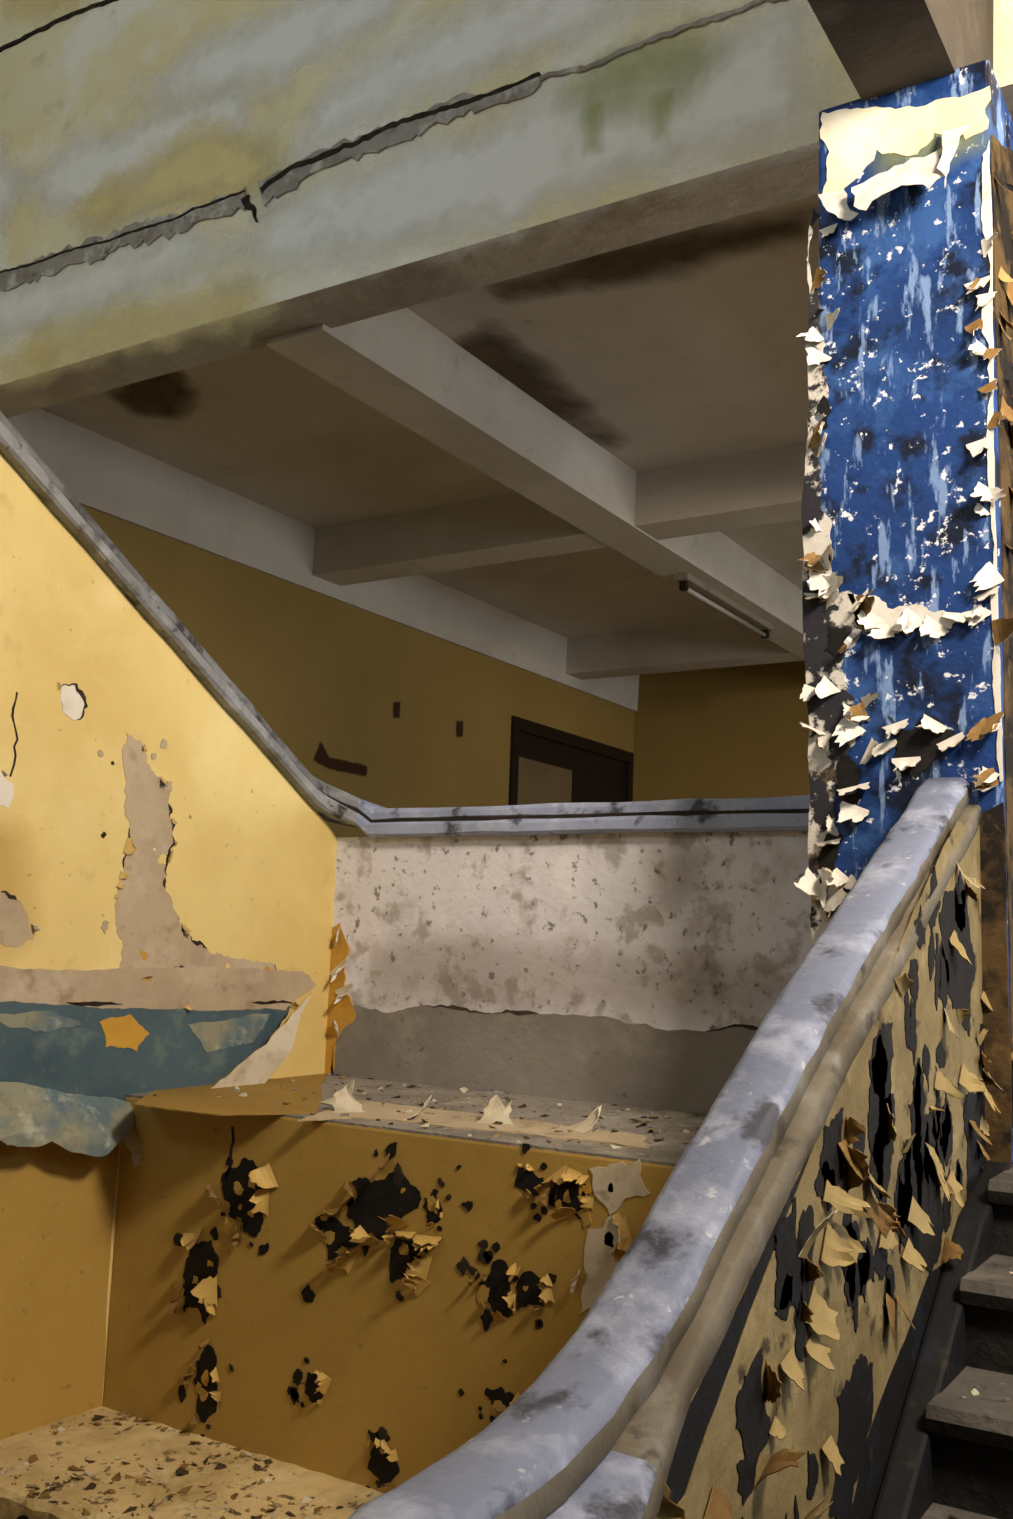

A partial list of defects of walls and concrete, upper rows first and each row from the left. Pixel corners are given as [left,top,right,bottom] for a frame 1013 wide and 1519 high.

peeling [31,0,399,225]
crack [0,0,789,292]
damp [116,373,191,416]
damp [458,335,613,443]
peeling [58,683,88,720]
peeling [253,0,1013,1519]
peeling [0,733,758,1332]
peeling [168,1156,278,1437]